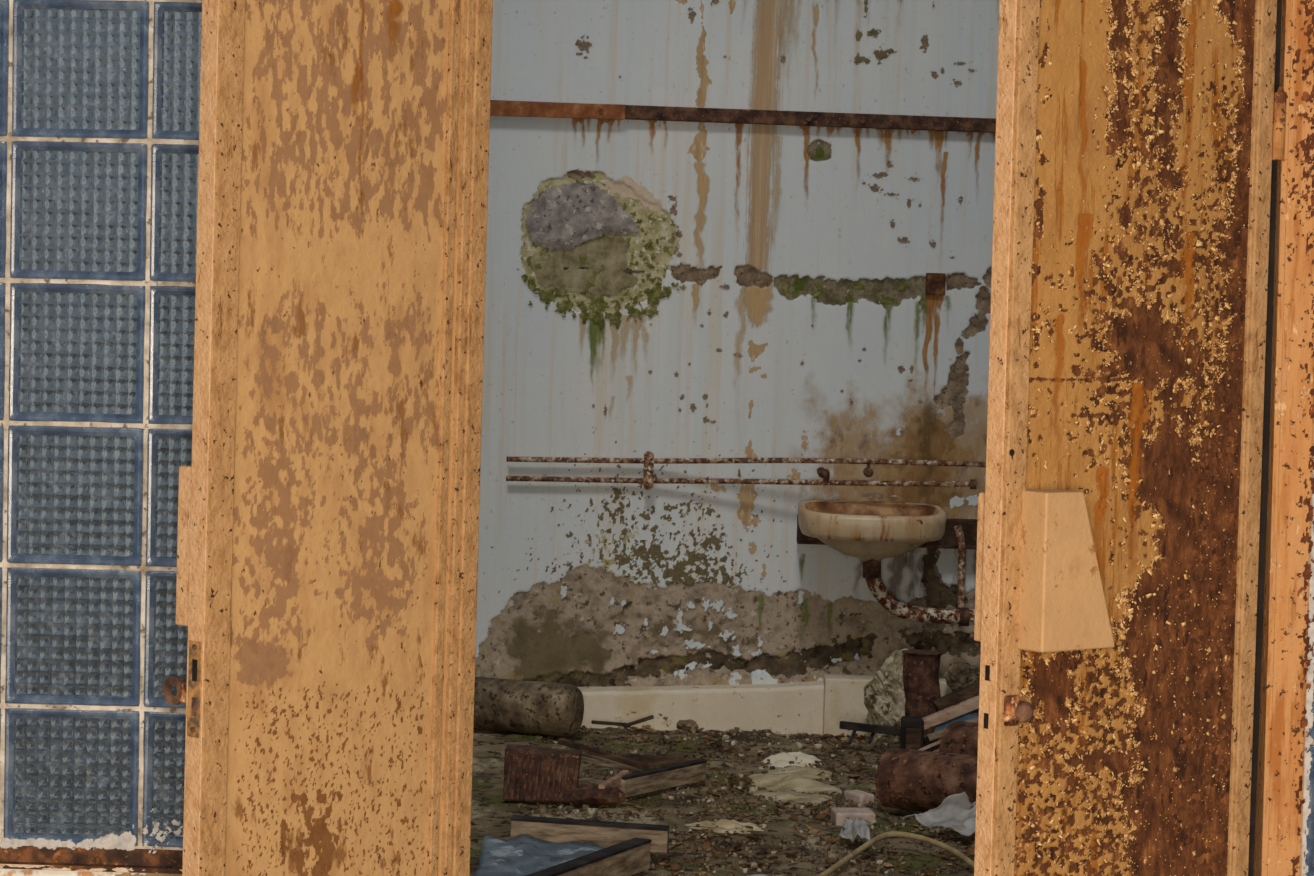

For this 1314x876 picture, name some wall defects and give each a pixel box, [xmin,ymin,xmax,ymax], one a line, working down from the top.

corrosion [353,0,365,132]
peeling [862,160,921,208]
corrosion [1288,0,1314,276]
leakage [506,605,612,682]
leakage [514,453,787,648]
spalling [475,484,980,687]
peeling [787,430,809,479]
corrosion [1015,0,1256,876]
corrosion [1292,300,1314,836]
corrosion [233,681,431,876]